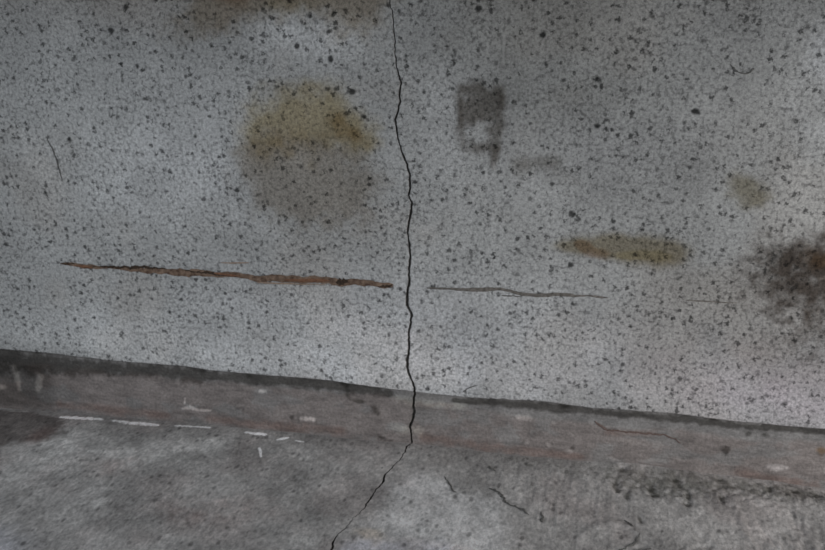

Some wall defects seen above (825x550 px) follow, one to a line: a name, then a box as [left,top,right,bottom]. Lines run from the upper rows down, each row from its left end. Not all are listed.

leakage [450,76,584,191]
leakage [717,165,778,215]
leakage [776,8,825,166]
corrosion [60,262,393,289]
crack [330,0,608,550]
corrosion [546,228,700,274]
leakage [723,222,825,371]
crack [619,520,651,550]